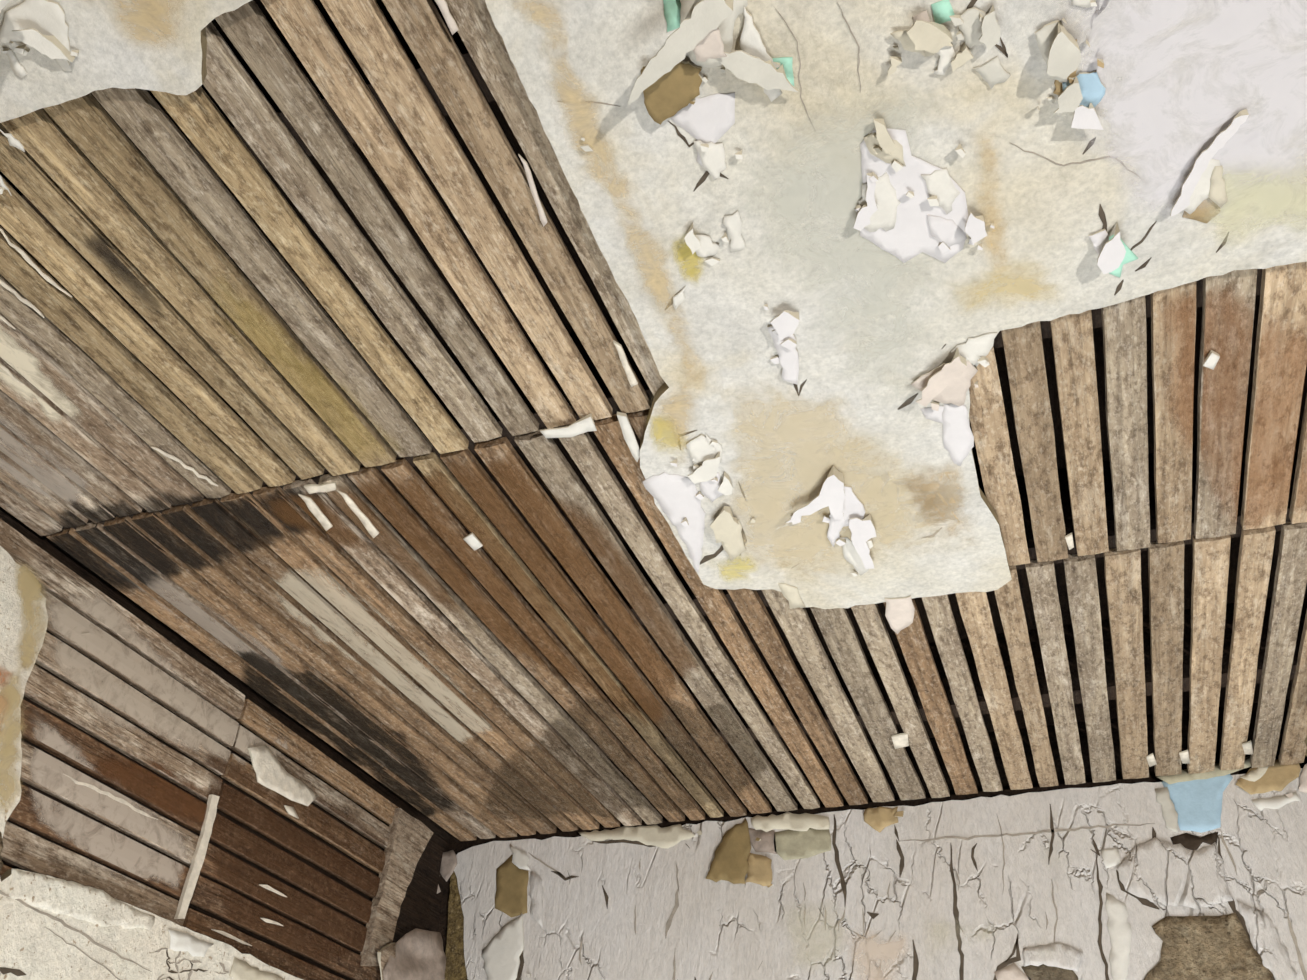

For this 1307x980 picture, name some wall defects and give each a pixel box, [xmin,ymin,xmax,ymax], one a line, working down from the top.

peeling [627,0,799,191]
peeling [911,332,998,466]
peeling [785,466,876,577]
damp [0,422,695,816]
spalling [885,595,915,634]
damp [31,725,184,885]
peeling [0,832,155,930]
crack [0,890,229,980]
crack [528,852,713,980]
crack [803,804,1155,980]
spalling [1144,901,1297,980]
crack [1218,832,1307,980]